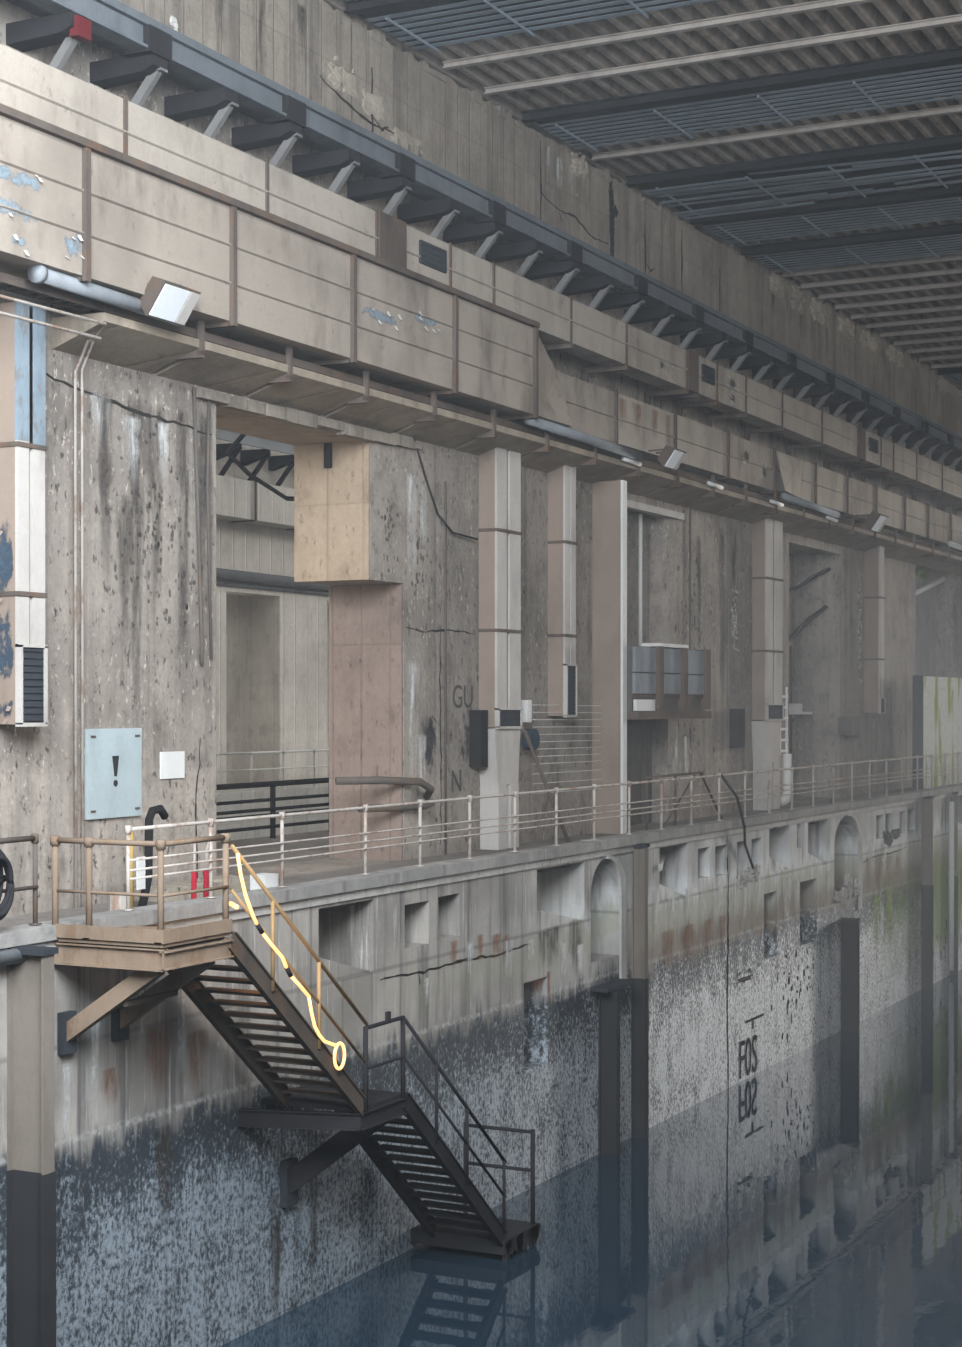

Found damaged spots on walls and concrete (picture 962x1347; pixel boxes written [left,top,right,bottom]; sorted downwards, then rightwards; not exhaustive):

peeling [0,166,43,256]
peeling [65,233,85,259]
crack [540,140,683,292]
peeling [362,308,441,333]
leakage [97,398,110,506]
leakage [119,408,167,601]
leakage [180,421,211,542]
crack [380,943,532,984]